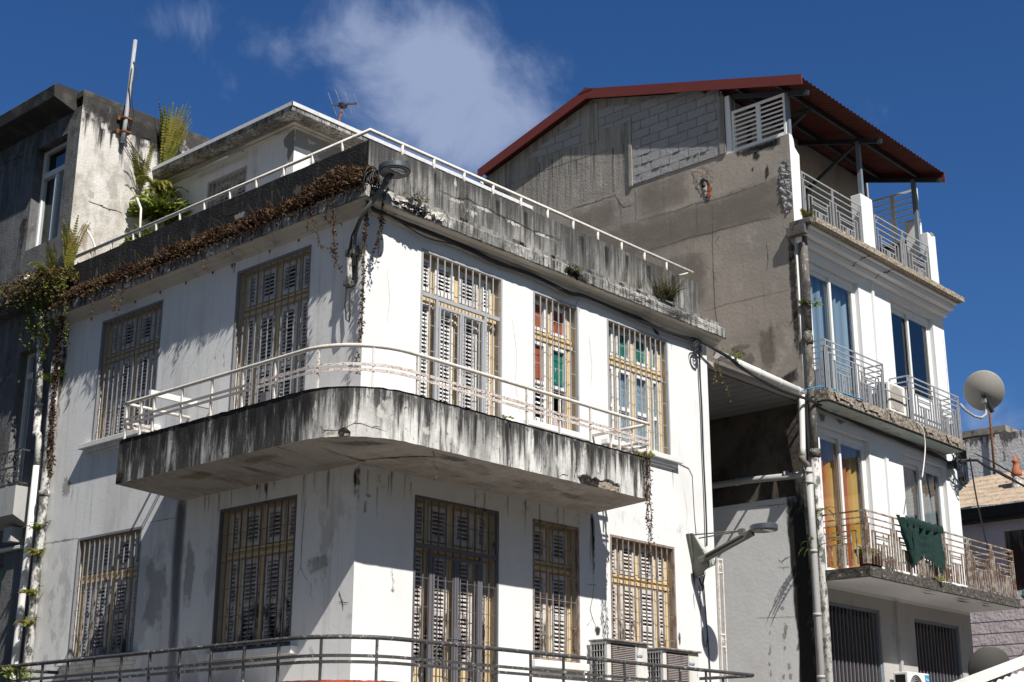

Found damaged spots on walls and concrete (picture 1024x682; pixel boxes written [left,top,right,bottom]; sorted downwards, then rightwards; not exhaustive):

water stain [85,108,161,156]
water stain [470,200,527,226]
water stain [162,394,317,453]
spalling [577,474,621,492]
water stain [170,501,185,671]